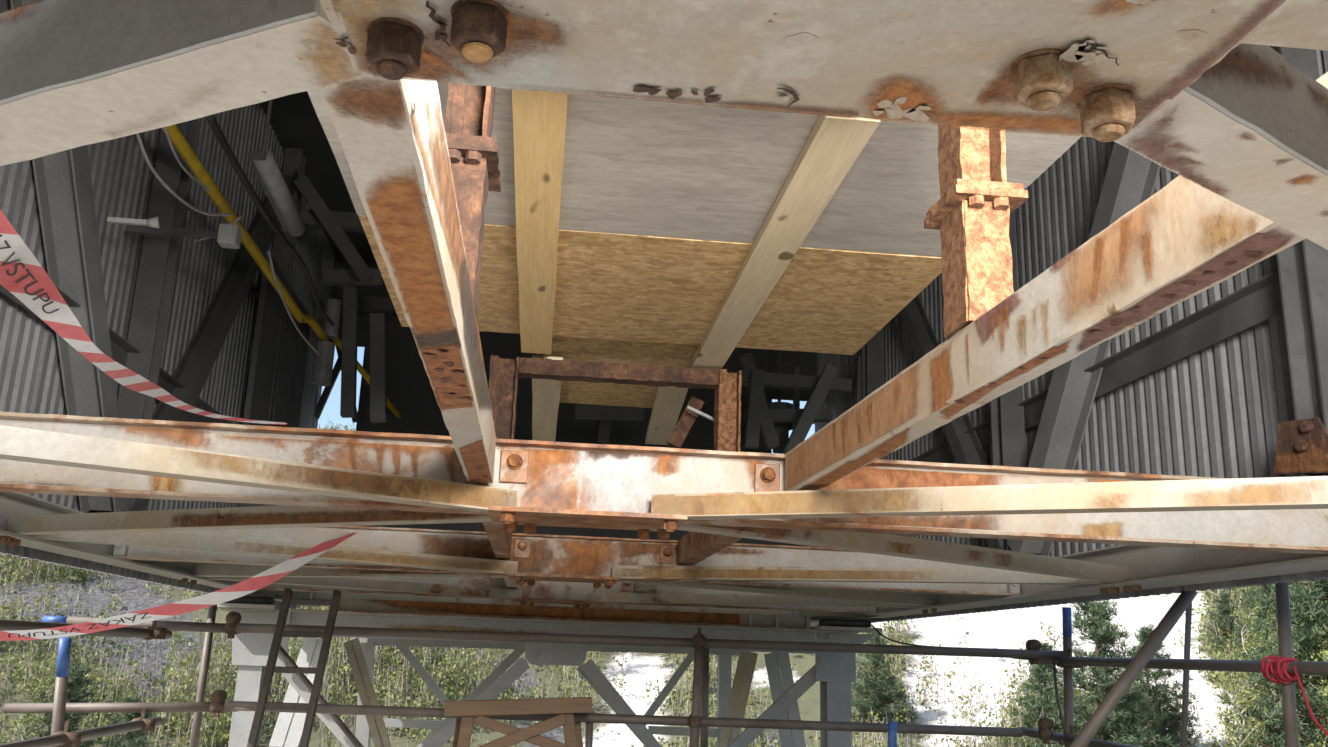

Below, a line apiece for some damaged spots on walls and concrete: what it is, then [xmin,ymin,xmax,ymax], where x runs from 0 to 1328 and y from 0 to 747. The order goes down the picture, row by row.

peeling [1097,0,1153,16]
peeling [1059,37,1119,66]
rust [520,0,1291,196]
rust [304,0,562,363]
rust [1288,177,1313,185]
rust [966,293,1047,382]
rust [151,476,179,492]
rust [126,426,247,473]
rust [175,434,903,589]
rust [663,349,999,536]
rust [1084,502,1121,537]
rust [1197,442,1328,506]